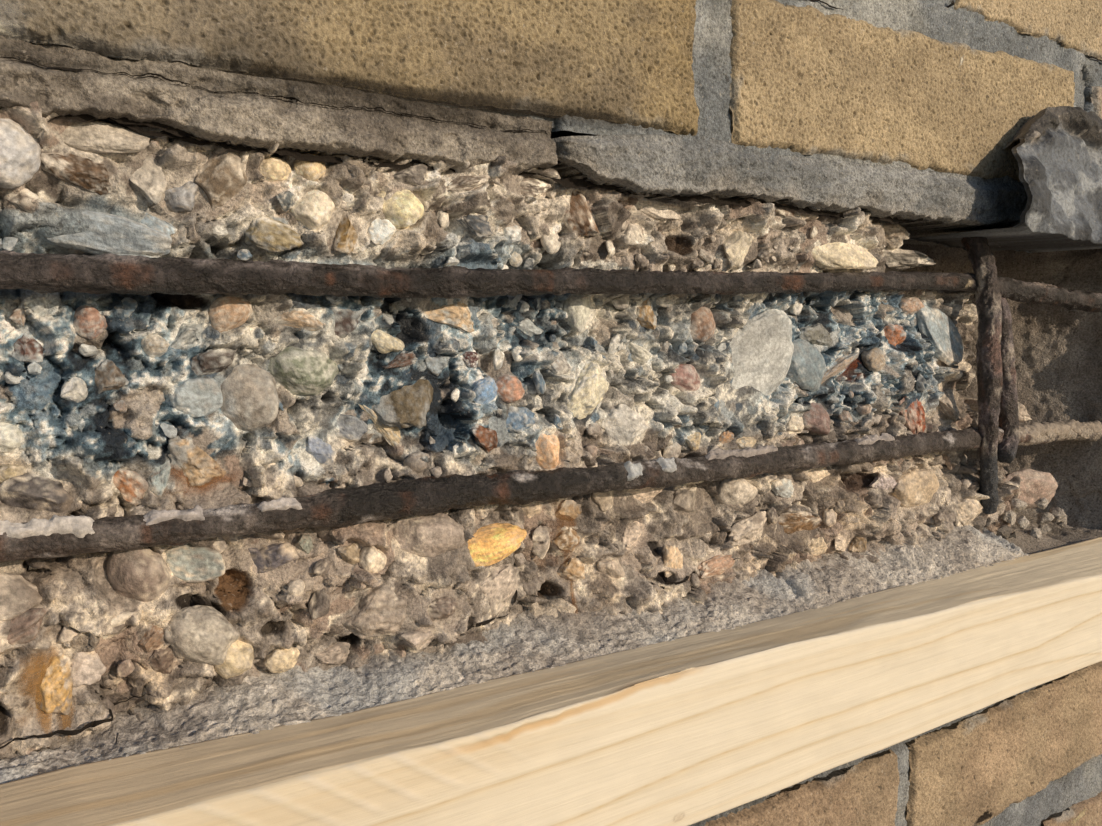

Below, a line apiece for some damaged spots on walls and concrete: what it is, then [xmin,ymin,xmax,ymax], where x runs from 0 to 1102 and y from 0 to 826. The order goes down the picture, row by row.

crack [808,0,843,10]
crack [0,57,548,135]
crack [47,114,455,172]
crack [519,171,915,224]
spalling [997,276,1102,313]
spalling [0,101,1058,760]
spalling [1018,402,1102,446]
rust [558,515,575,536]